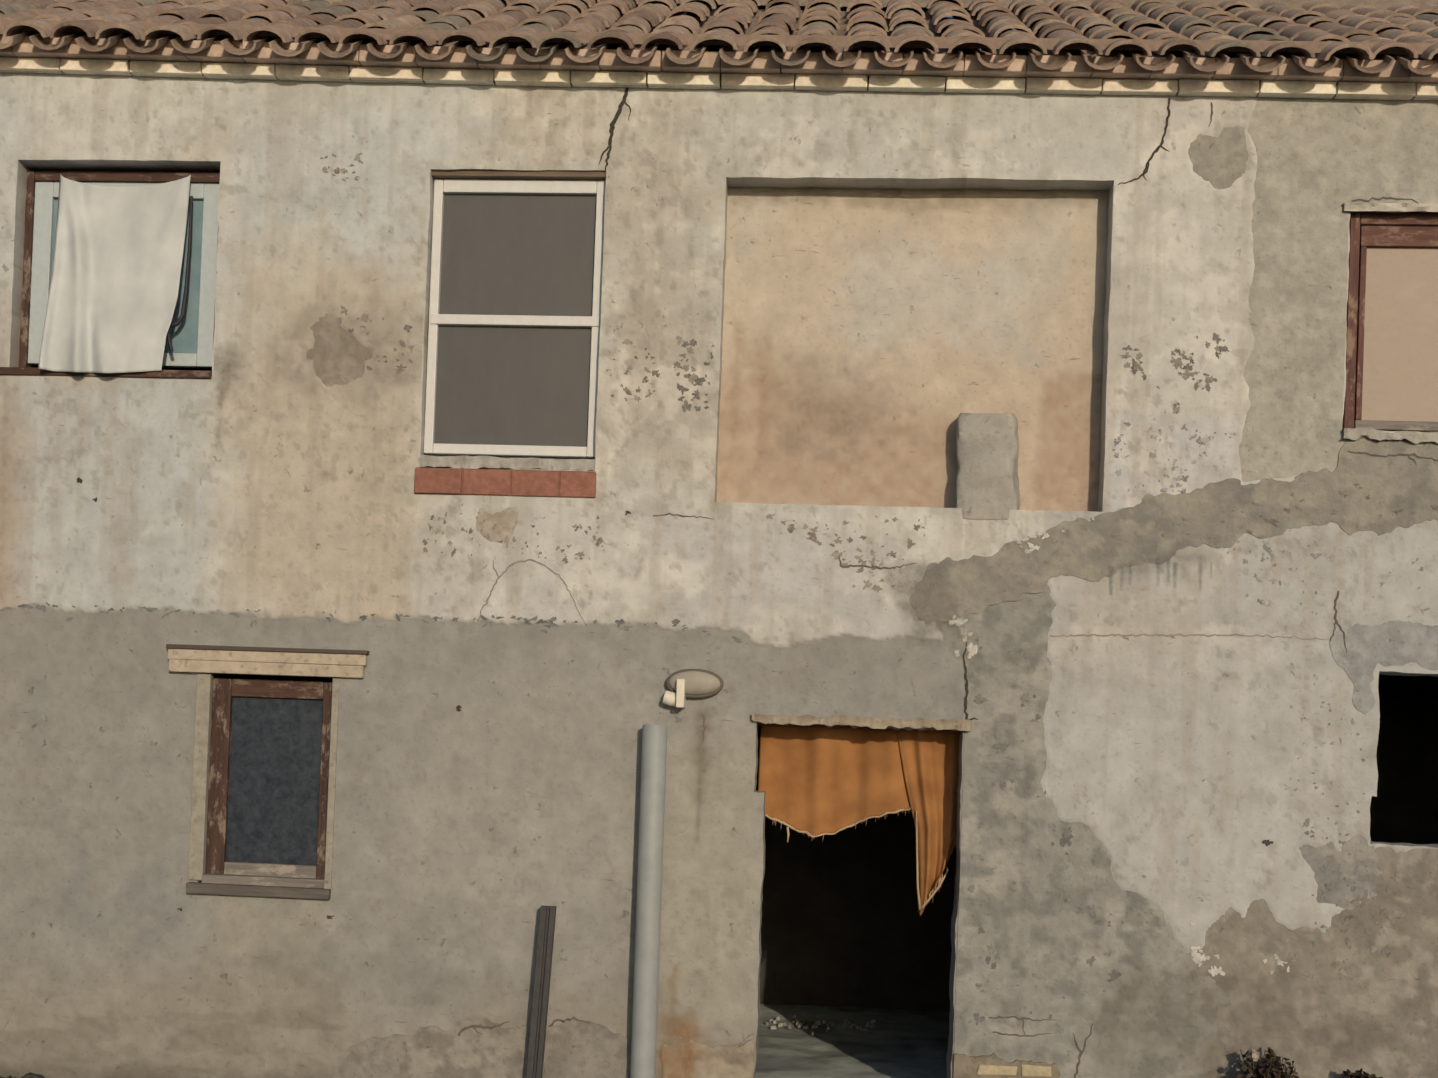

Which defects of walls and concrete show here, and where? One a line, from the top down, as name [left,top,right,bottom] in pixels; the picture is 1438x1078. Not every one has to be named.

crack [598,87,631,170]
crack [1118,98,1171,185]
peeling [307,306,414,387]
peeling [606,336,714,412]
flaking render [1112,97,1438,607]
crack [477,558,586,624]
peeling [766,514,925,592]
peeling [1019,530,1065,554]
crack [962,642,978,720]
flaking render [936,584,1438,1078]